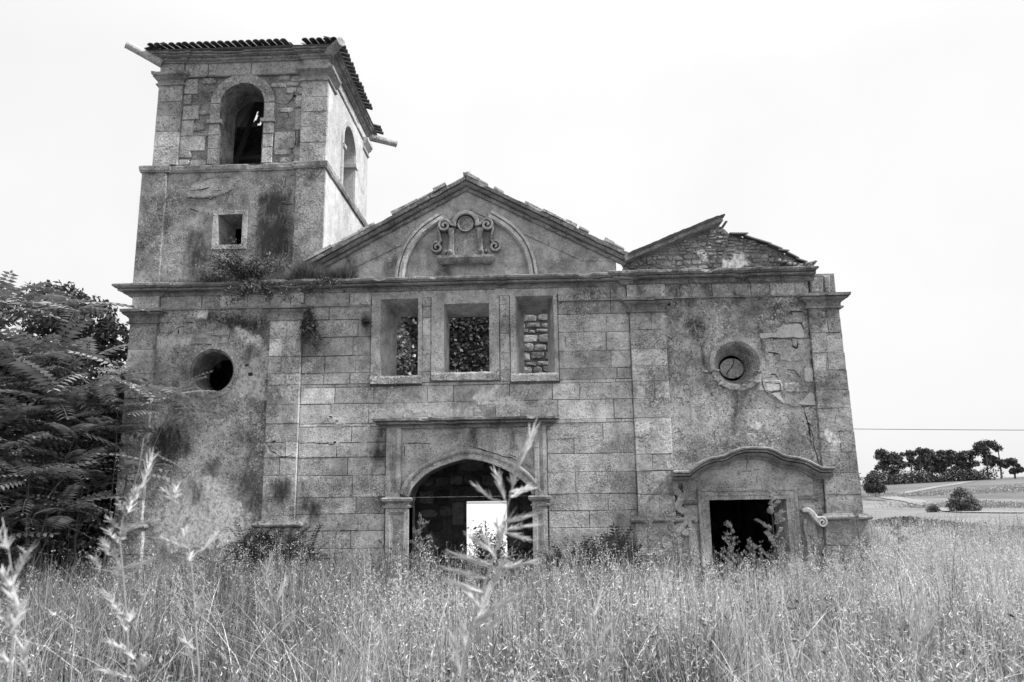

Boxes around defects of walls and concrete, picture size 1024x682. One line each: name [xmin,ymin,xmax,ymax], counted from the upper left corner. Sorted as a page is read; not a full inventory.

damp [257,193,291,260]
flaking render [758,304,816,407]
damp [152,426,189,459]
crack [794,405,821,466]